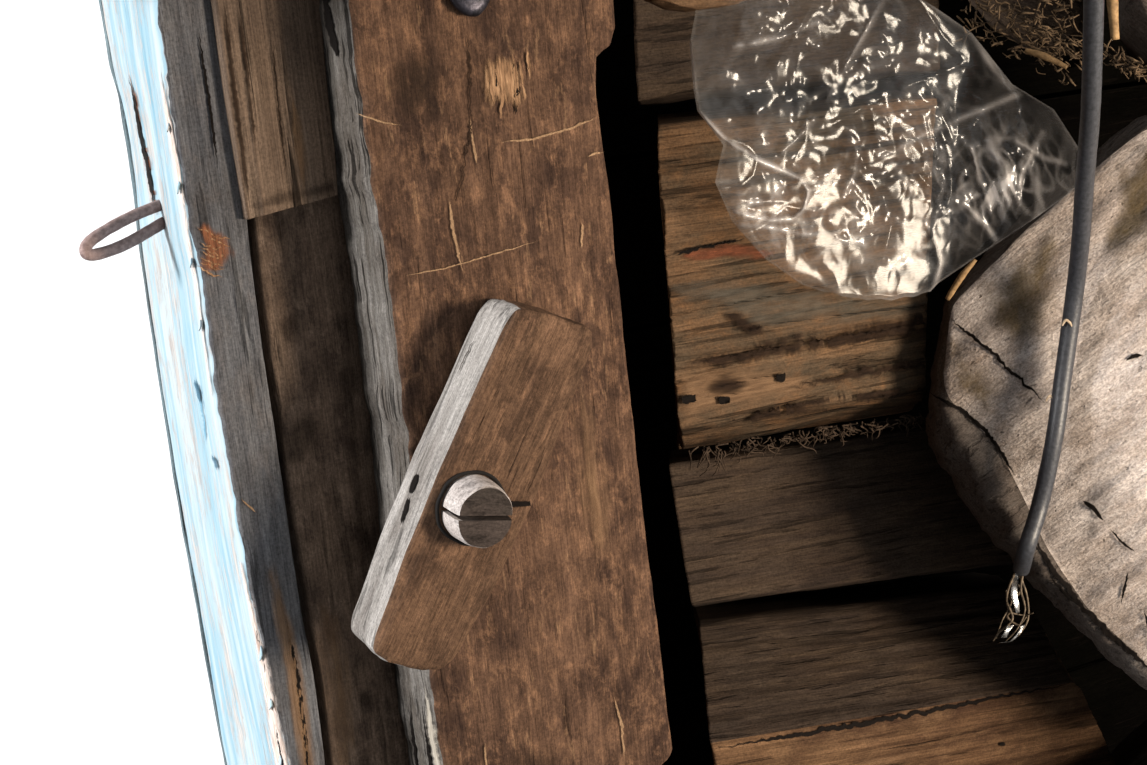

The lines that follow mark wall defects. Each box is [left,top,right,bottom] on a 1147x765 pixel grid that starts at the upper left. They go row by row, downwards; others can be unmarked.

crack [949,316,1045,403]
crack [719,682,1074,748]